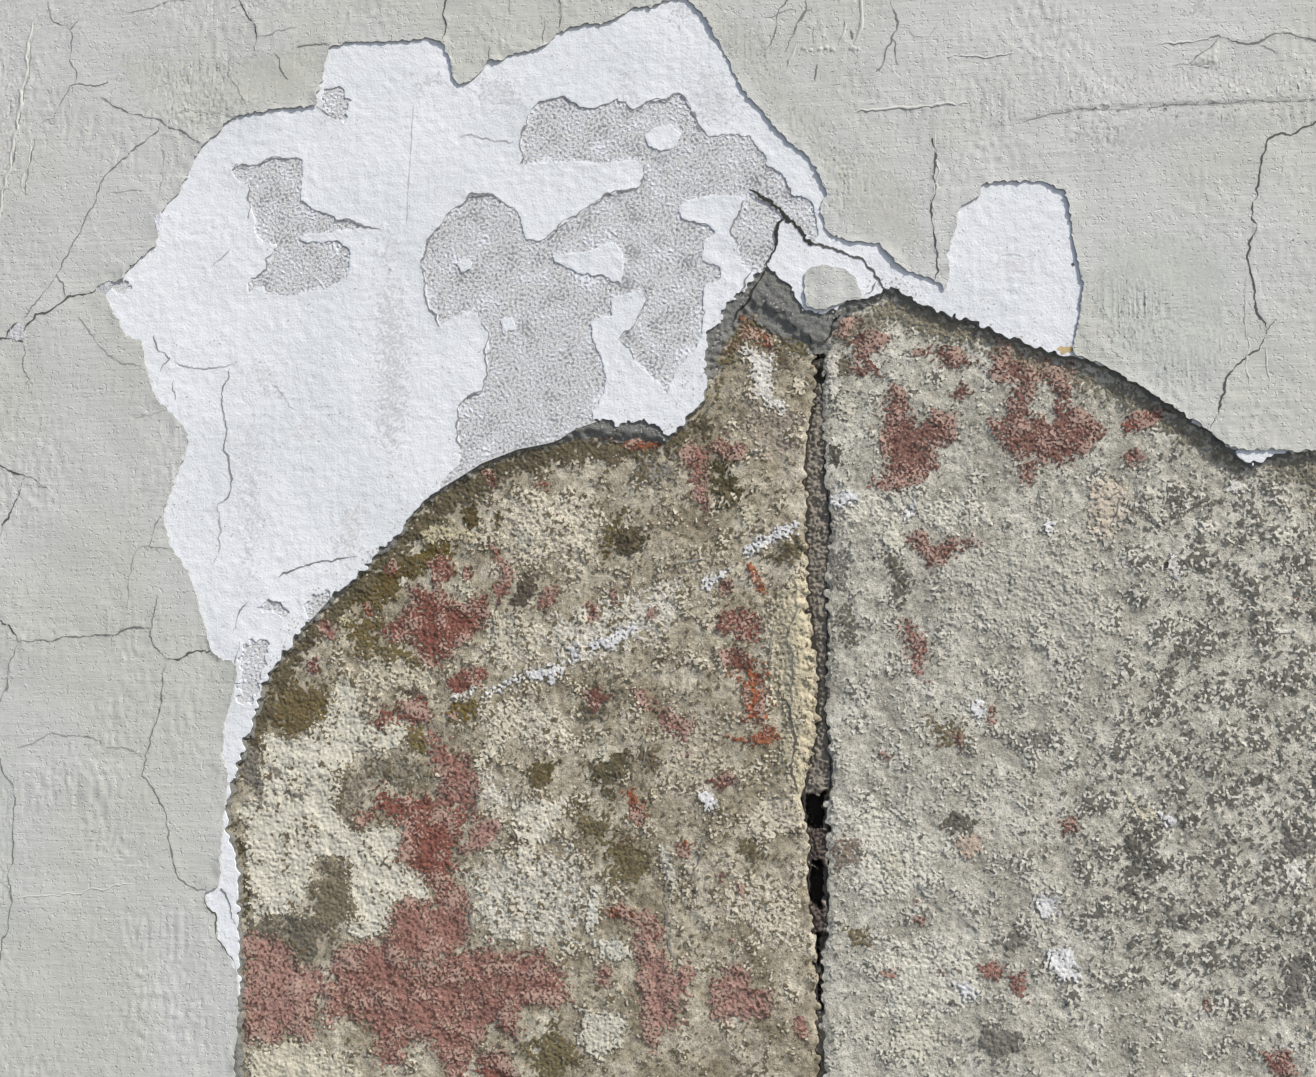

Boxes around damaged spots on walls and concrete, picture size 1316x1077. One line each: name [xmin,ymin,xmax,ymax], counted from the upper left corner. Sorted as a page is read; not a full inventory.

crack [1173,32,1316,66]
crack [0,0,327,384]
crack [733,269,841,343]
crack [930,138,939,278]
crack [1211,121,1316,426]
crack [0,465,47,535]
peeling [96,0,1107,995]
crack [1096,482,1183,544]
peeling [1225,444,1308,466]
crack [0,517,236,969]
crack [768,374,831,1017]